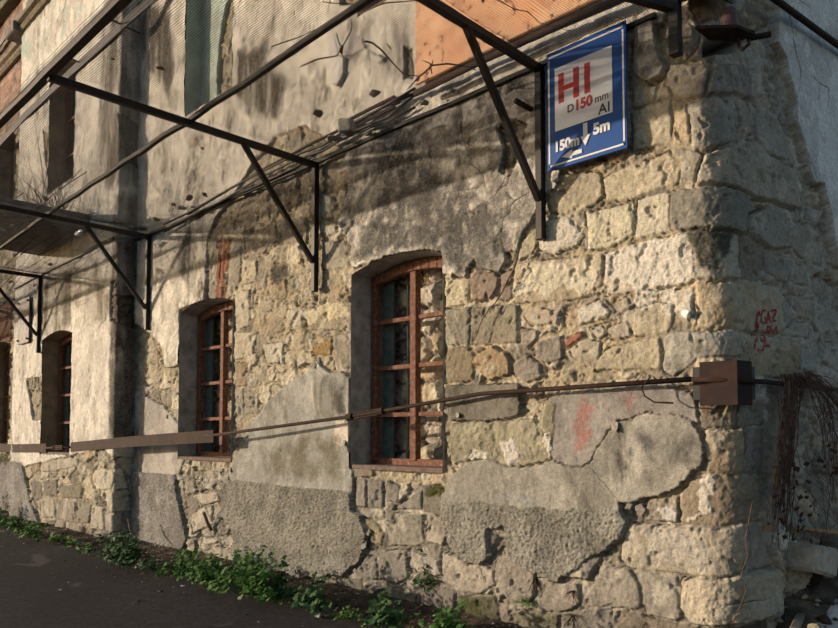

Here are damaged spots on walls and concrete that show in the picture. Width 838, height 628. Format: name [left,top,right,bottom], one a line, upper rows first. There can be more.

damp [100,16,140,186]
damp [138,6,174,91]
damp [237,43,285,118]
crack [454,104,528,248]
damp [97,199,138,438]
flaking render [109,279,179,421]
flaking render [177,124,362,561]
flaking render [347,0,838,628]